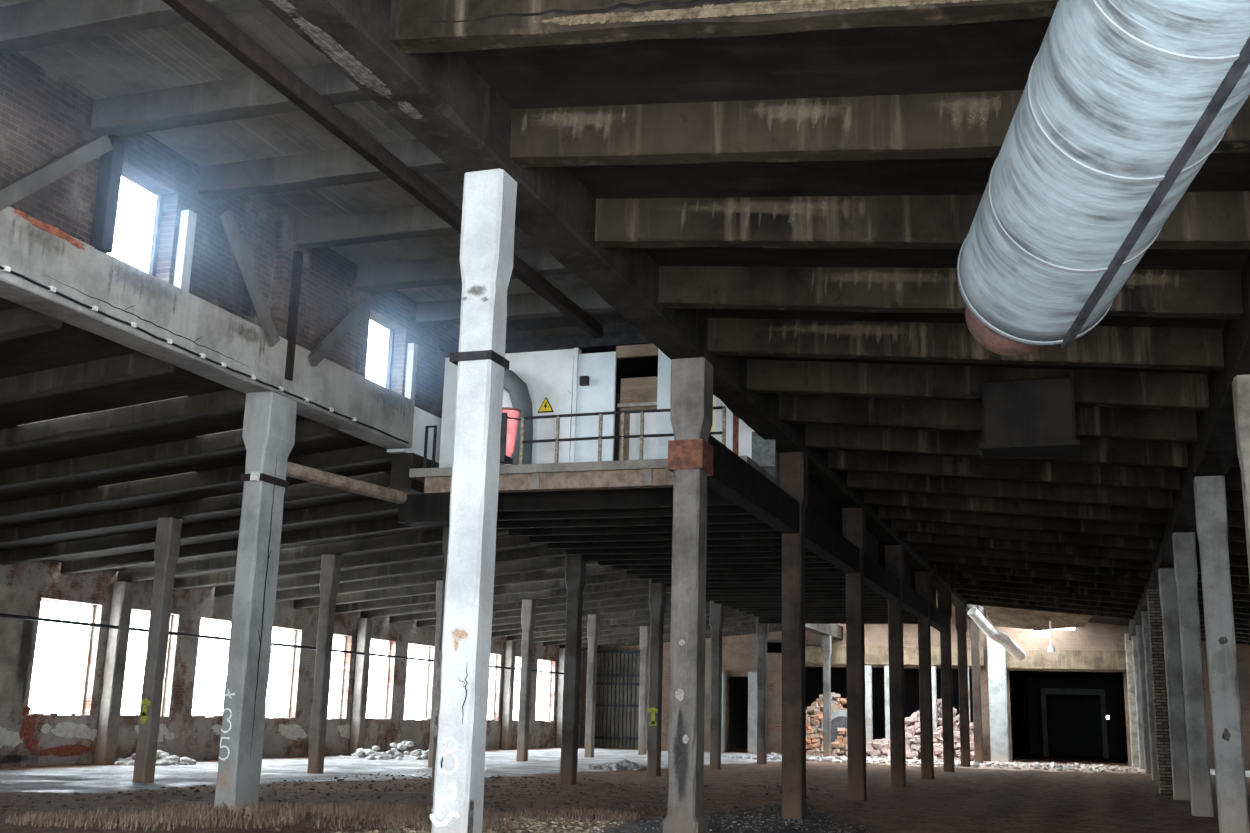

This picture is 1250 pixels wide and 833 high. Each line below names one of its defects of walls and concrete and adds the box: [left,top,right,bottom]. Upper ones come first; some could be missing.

peeling [0,706,97,757]